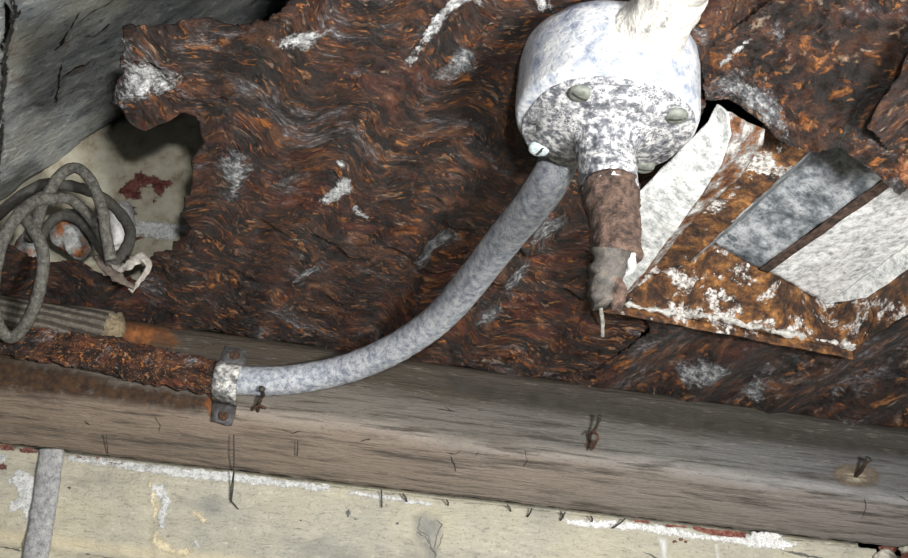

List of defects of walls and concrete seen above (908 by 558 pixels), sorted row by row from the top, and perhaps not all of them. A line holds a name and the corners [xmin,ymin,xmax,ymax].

crack [0,0,21,173]
peeling [718,77,788,137]
peeling [895,154,908,183]
peeling [118,171,189,241]
peeling [93,252,152,293]
corrosion [123,324,158,345]
corrosion [0,354,212,414]
crack [782,550,822,558]